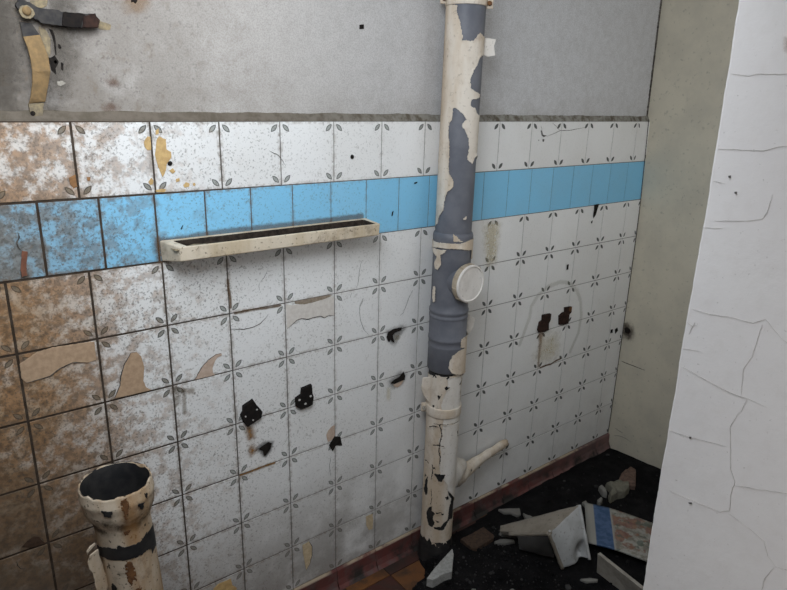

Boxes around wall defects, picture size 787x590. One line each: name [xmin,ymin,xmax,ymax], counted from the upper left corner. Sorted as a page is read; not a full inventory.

spalling [30,0,48,8]
spalling [39,26,66,86]
spalling [144,128,196,192]
spalling [286,295,334,329]
spalling [387,327,402,343]
spalling [20,342,96,383]
spalling [115,352,150,398]
spalling [195,353,222,380]
spalling [326,426,342,451]
crack [669,310,787,589]